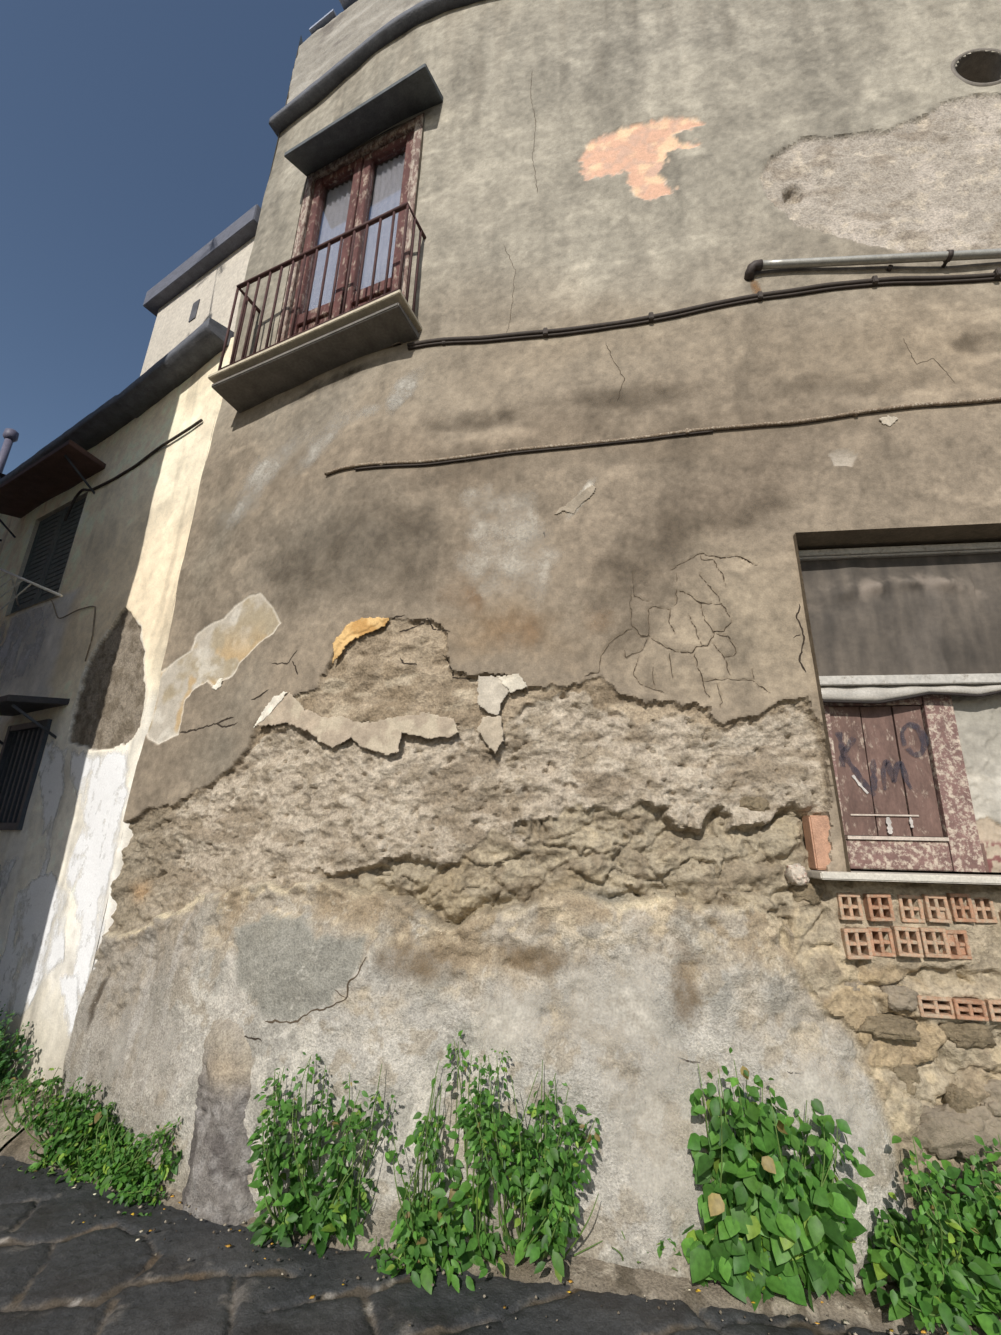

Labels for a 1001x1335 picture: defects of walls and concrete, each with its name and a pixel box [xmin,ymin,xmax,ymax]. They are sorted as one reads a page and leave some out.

peeling [760,91,1001,253]
crack [586,539,806,703]
spalling [0,591,1001,1232]
crack [244,957,366,1040]